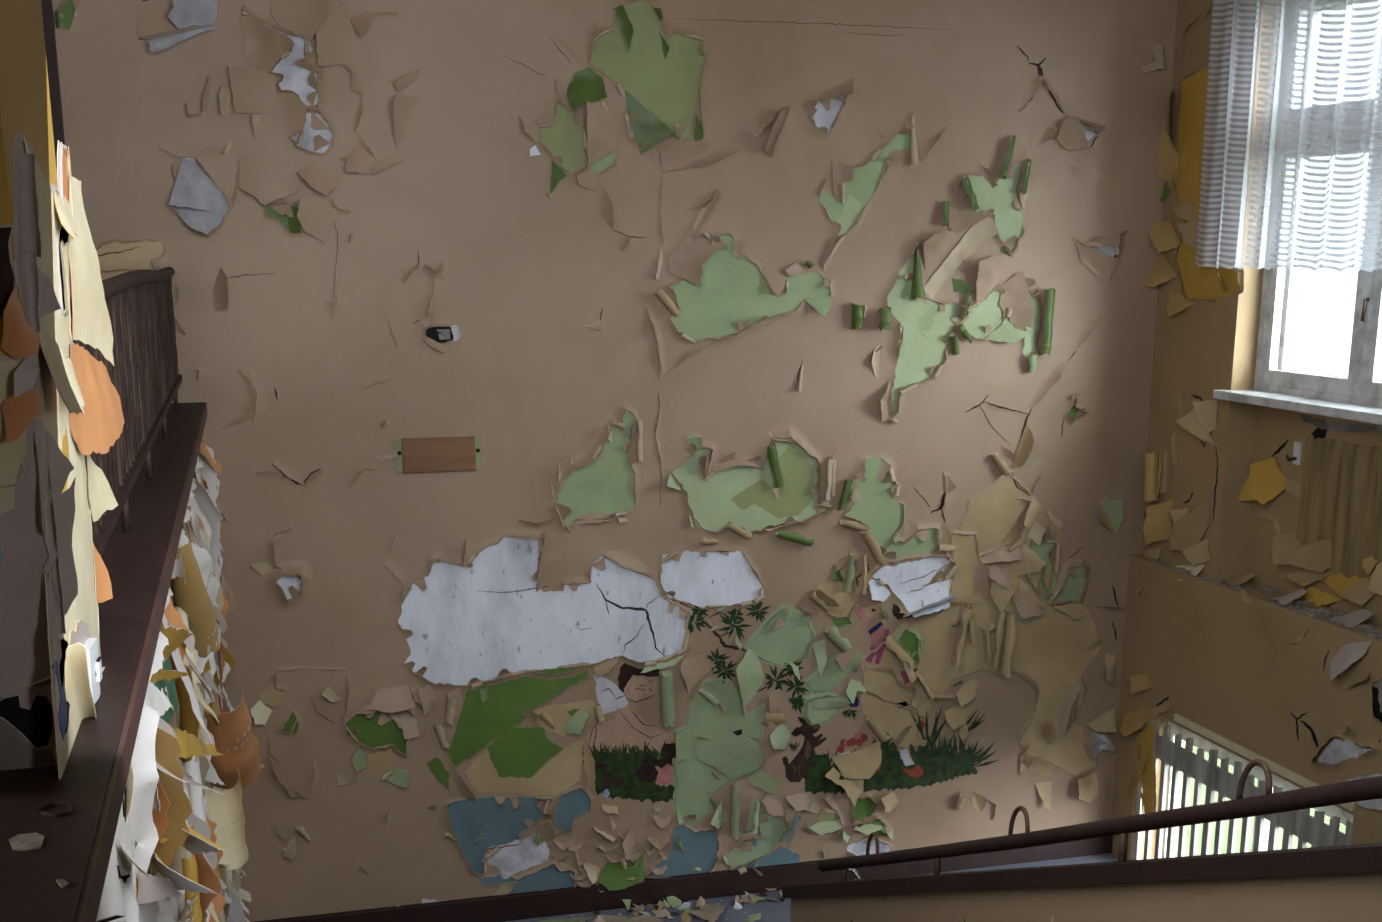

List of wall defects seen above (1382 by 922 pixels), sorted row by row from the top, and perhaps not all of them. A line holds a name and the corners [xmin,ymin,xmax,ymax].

peeling [53,0,81,35]
crack [1016,46,1068,114]
peeling [0,129,170,780]
spalling [117,0,1129,922]
peeling [1143,379,1218,581]
peeling [1238,439,1382,606]
spalling [1298,413,1382,440]
peeling [1323,641,1382,727]
spalling [9,832,45,851]